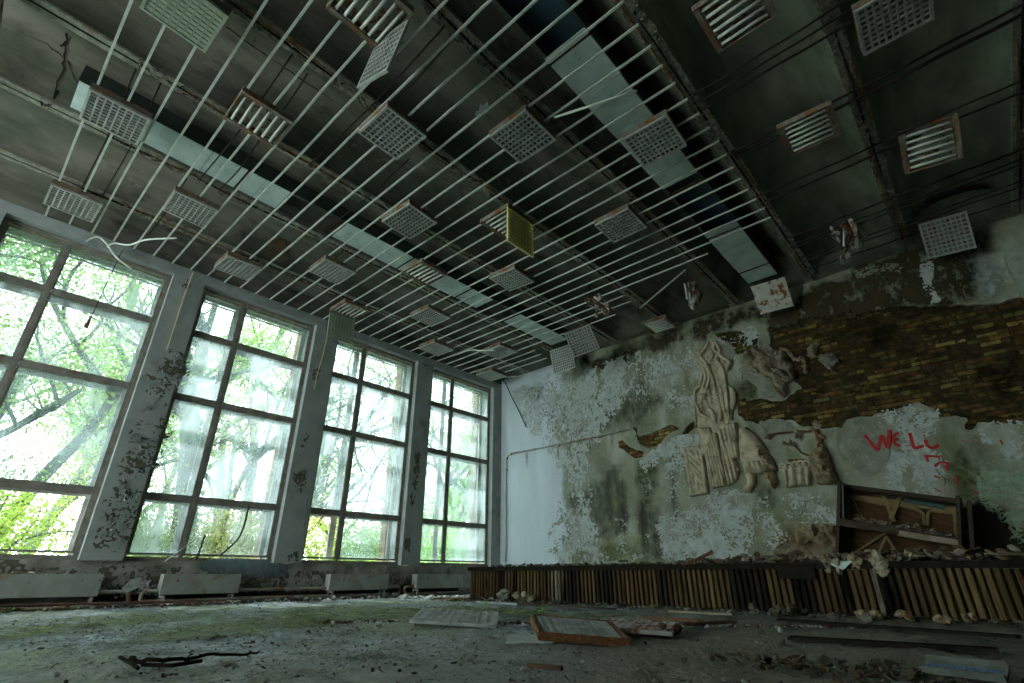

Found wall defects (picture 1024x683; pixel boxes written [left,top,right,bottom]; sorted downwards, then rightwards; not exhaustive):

crack [30,32,78,109]
peeling [90,349,190,554]
damp [571,467,661,561]
peeling [512,342,836,564]
flaking render [716,261,1024,547]